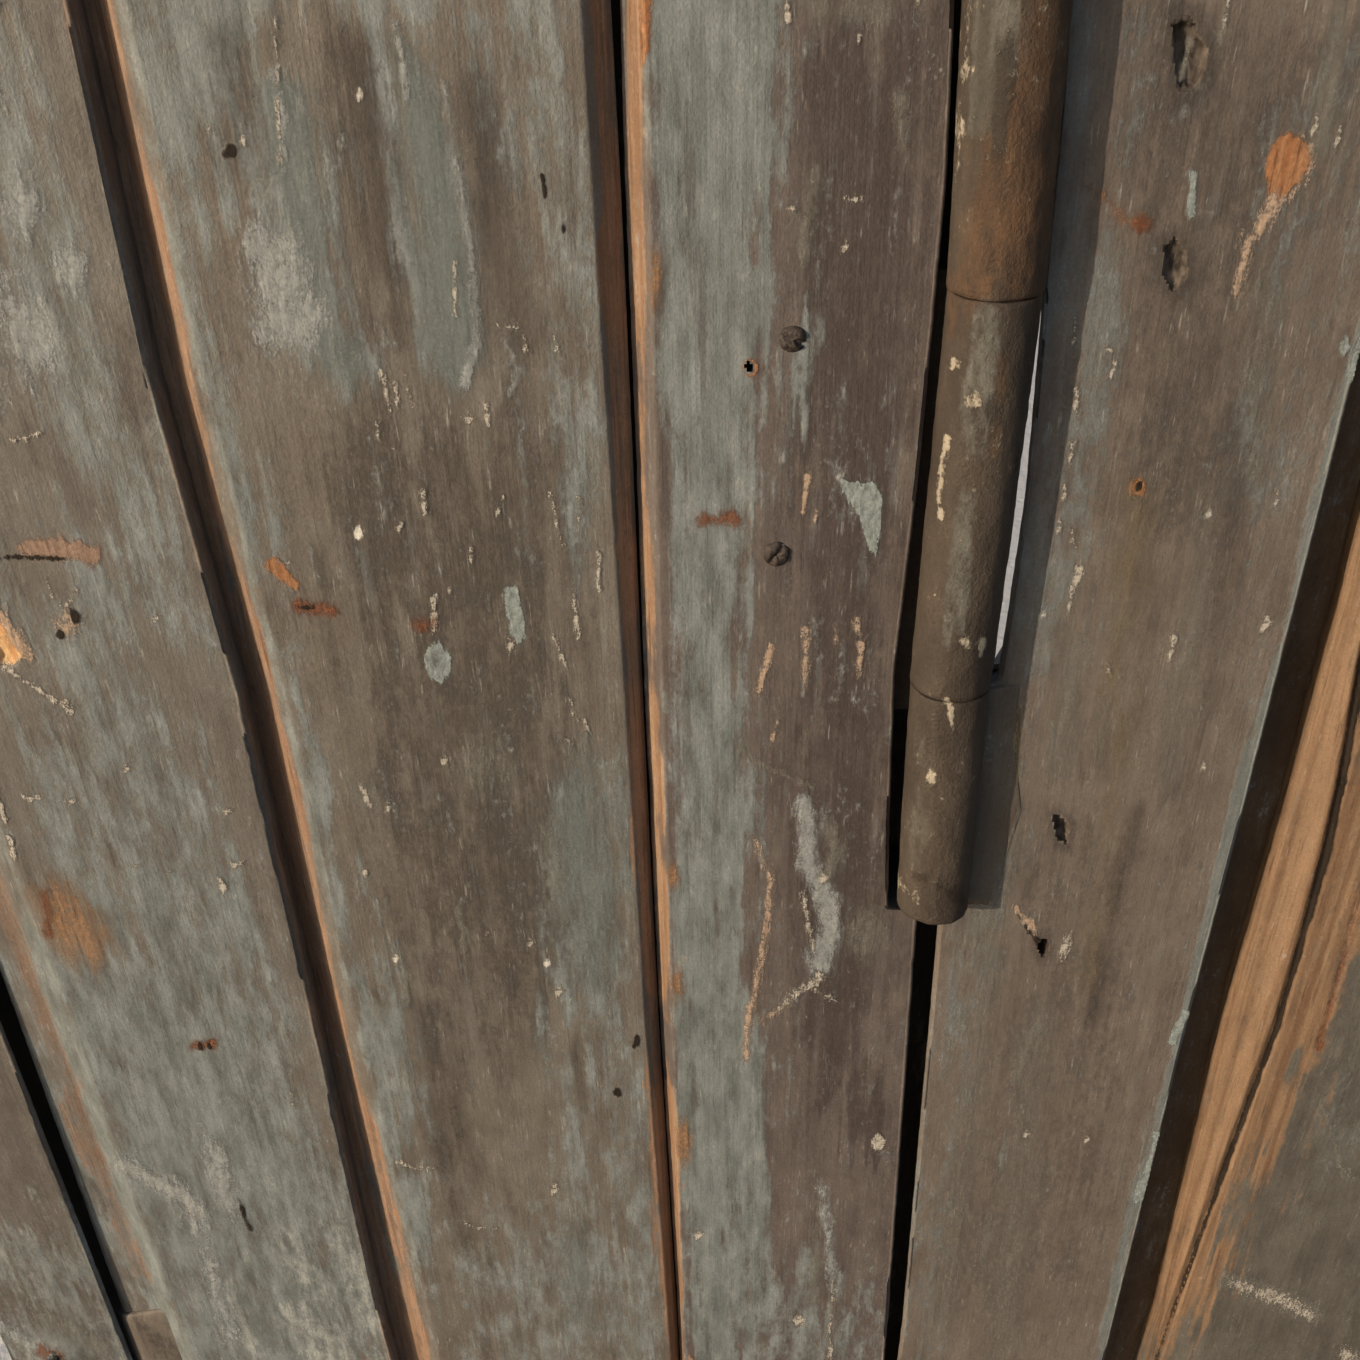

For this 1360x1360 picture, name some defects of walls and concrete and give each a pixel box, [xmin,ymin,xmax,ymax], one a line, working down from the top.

peeling [639,0,653,65]
spalling [1170,15,1209,92]
peeling [1231,131,1317,299]
spalling [1161,236,1189,292]
peeling [1103,342,1118,379]
peeling [1167,634,1178,667]
peeling [1260,615,1274,633]
crack [1154,655,1360,1360]